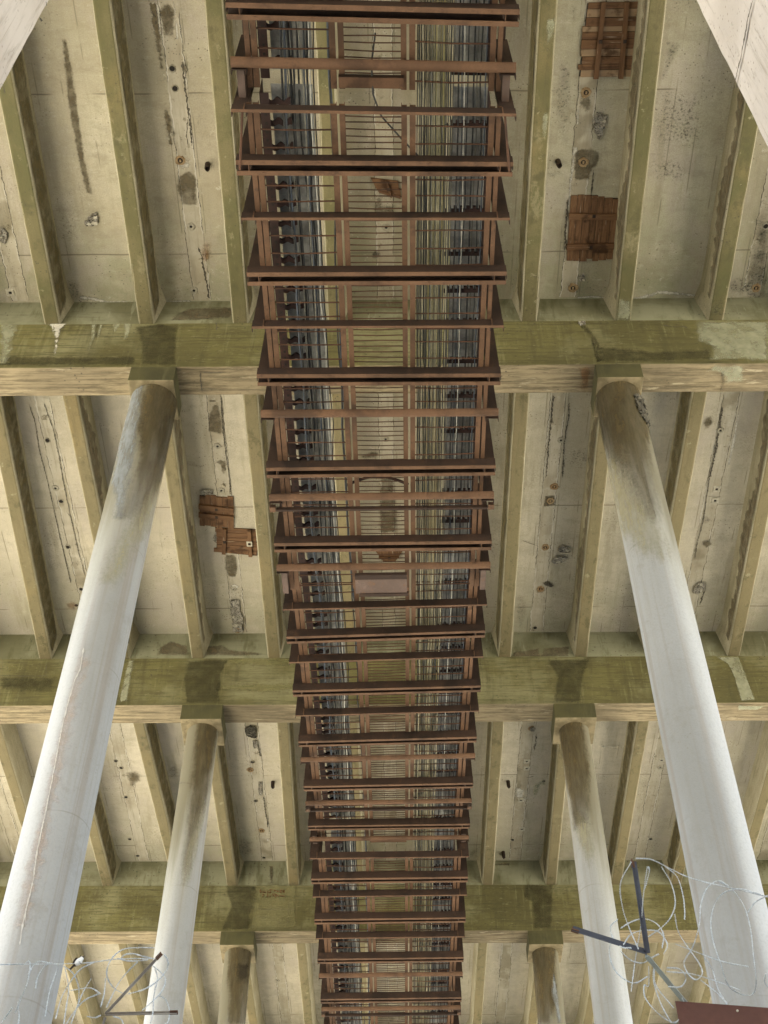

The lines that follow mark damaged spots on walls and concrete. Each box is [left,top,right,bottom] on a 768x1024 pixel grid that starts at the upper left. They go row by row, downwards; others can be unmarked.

spalling [84,212,99,226]
leakage [1,0,232,365]
crack [181,63,193,145]
spalling [592,112,608,141]
leakage [577,0,693,319]
crack [29,404,85,582]
leakage [79,395,104,512]
leakage [114,384,258,702]
crack [545,396,571,478]
leakage [514,381,650,702]
crack [695,407,723,557]
spalling [245,725,259,748]